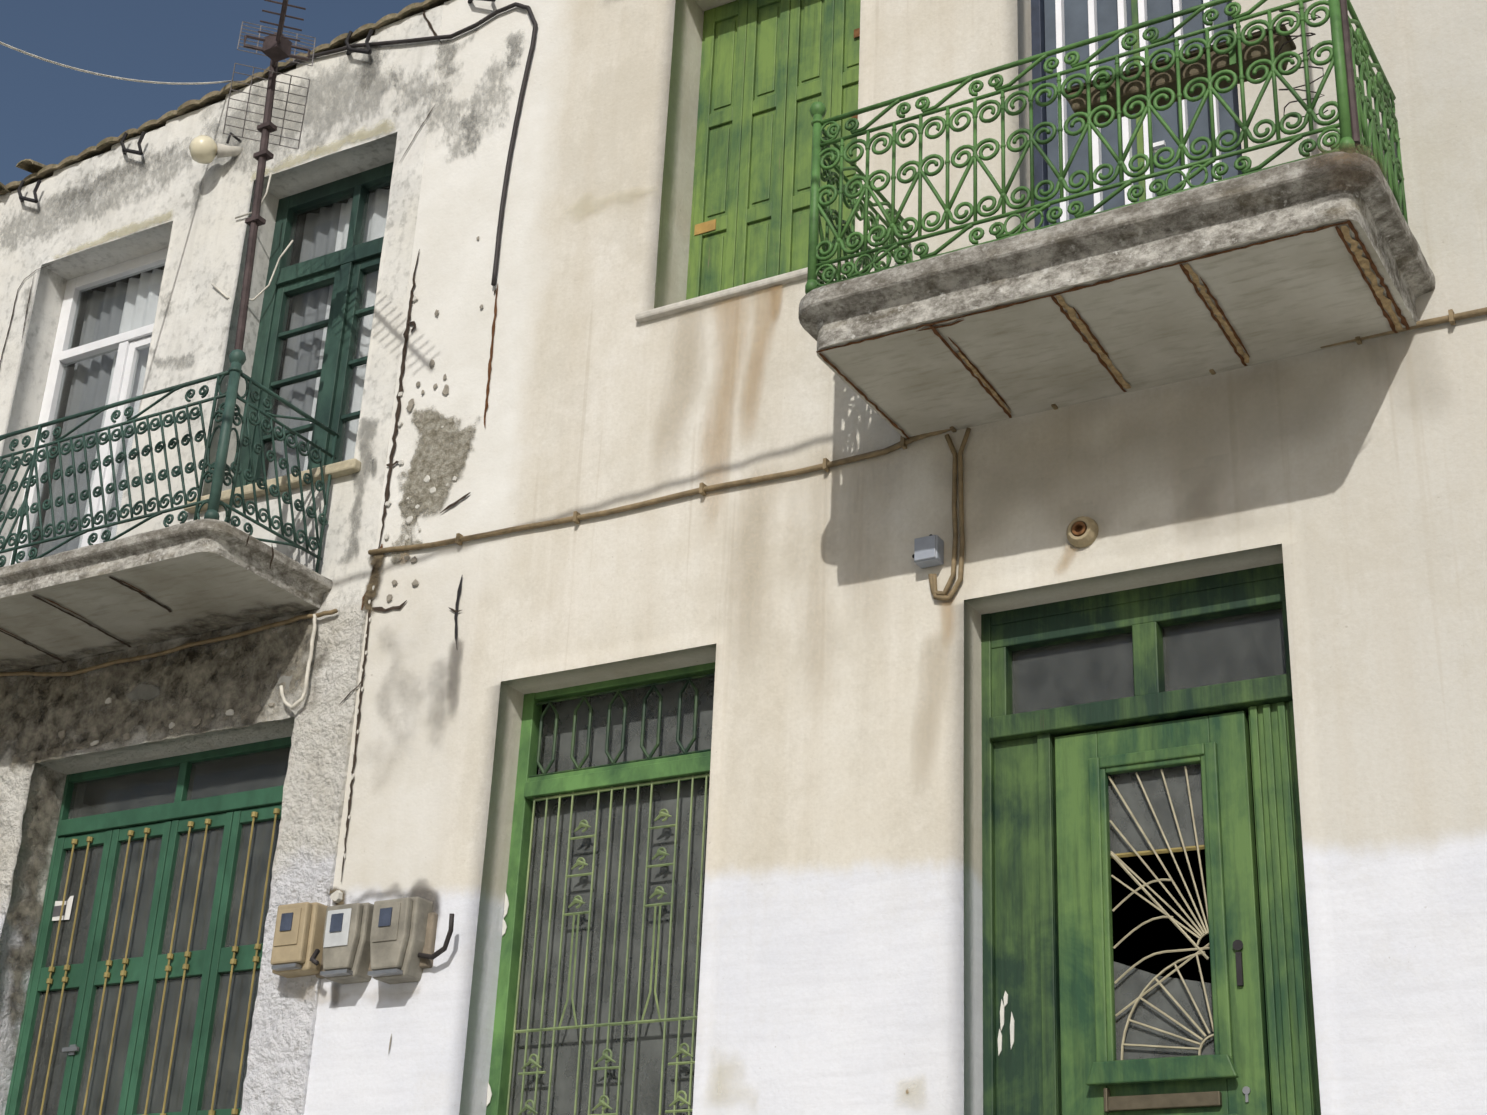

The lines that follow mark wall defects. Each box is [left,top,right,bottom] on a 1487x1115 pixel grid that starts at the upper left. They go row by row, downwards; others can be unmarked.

leakage [0,605,301,672]
crack [329,249,420,906]
spalling [387,359,479,602]
crack [448,576,462,702]
leakage [0,695,109,1035]
peeling [998,991,1014,1056]